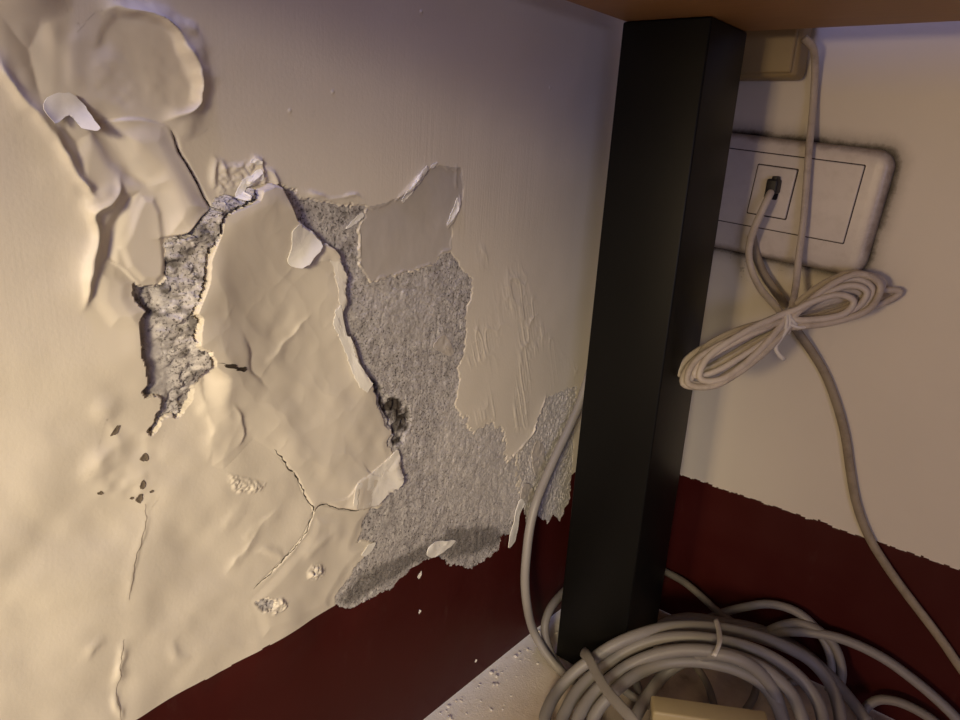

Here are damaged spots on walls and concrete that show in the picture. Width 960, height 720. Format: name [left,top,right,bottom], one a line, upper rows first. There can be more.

crack [255,449,359,587]
flaking render [83,121,577,639]